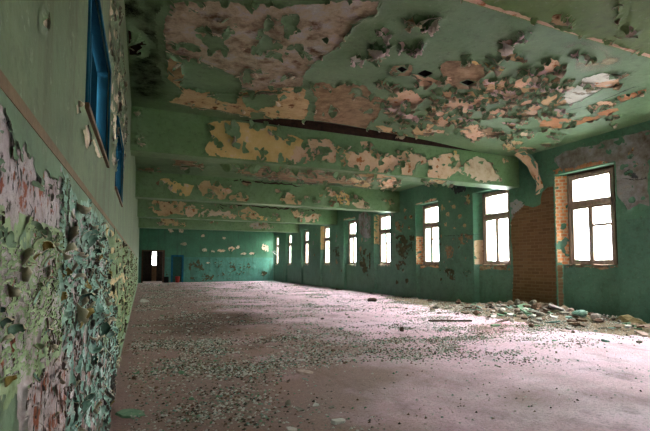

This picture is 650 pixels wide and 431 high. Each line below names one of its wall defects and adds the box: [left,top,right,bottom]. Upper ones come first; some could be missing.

peeling [0,95,138,431]
damp [129,6,161,96]
crack [243,119,476,152]
peeling [109,0,650,307]